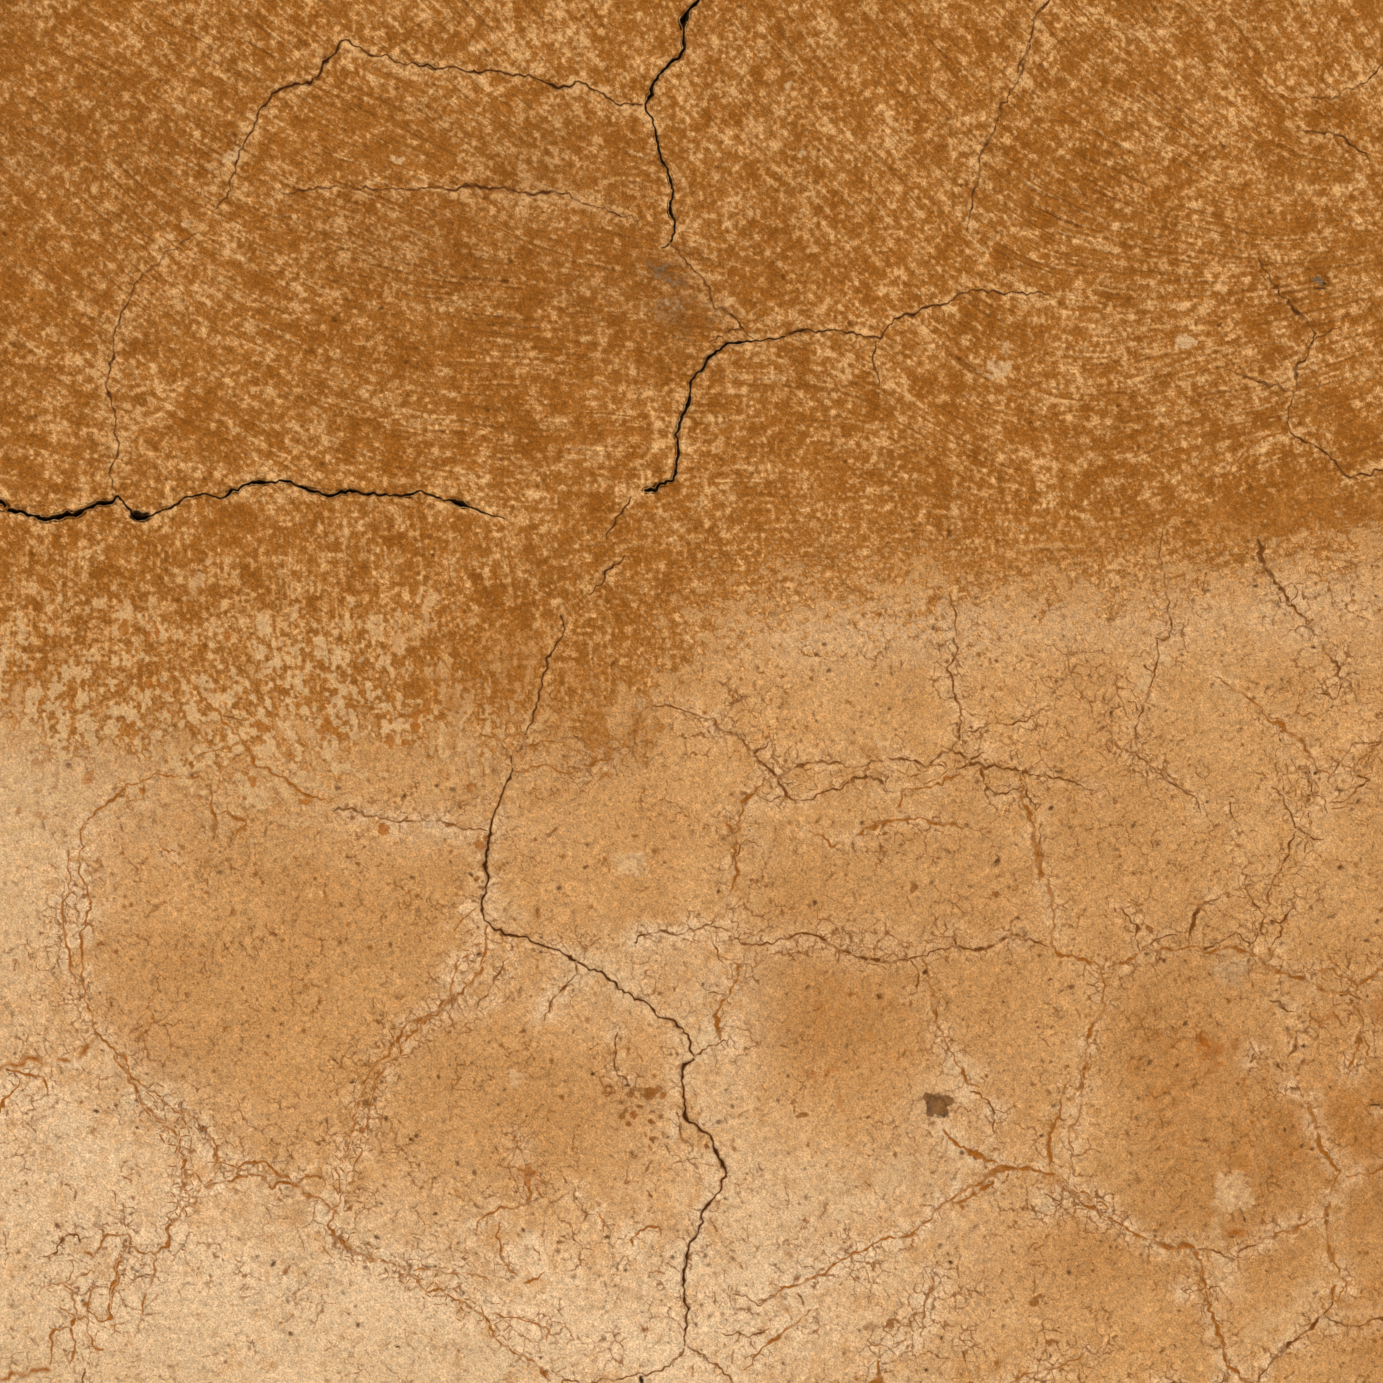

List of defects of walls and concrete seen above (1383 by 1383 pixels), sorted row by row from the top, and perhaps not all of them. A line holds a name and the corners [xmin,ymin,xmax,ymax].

crack [0,0,1052,597]
crack [966,0,1383,232]
crack [1127,257,1383,835]
crack [0,592,1383,1383]